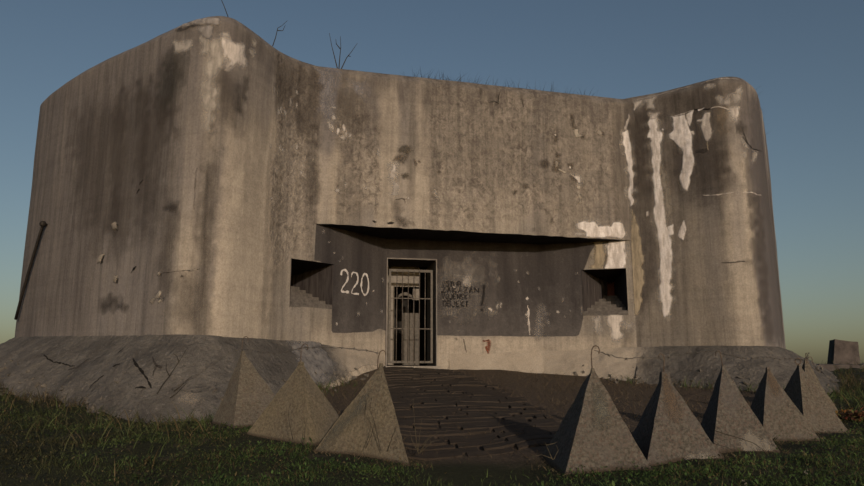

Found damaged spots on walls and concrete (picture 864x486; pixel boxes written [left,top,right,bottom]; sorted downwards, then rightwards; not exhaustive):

damp [174,33,256,126]
crack [671,106,729,117]